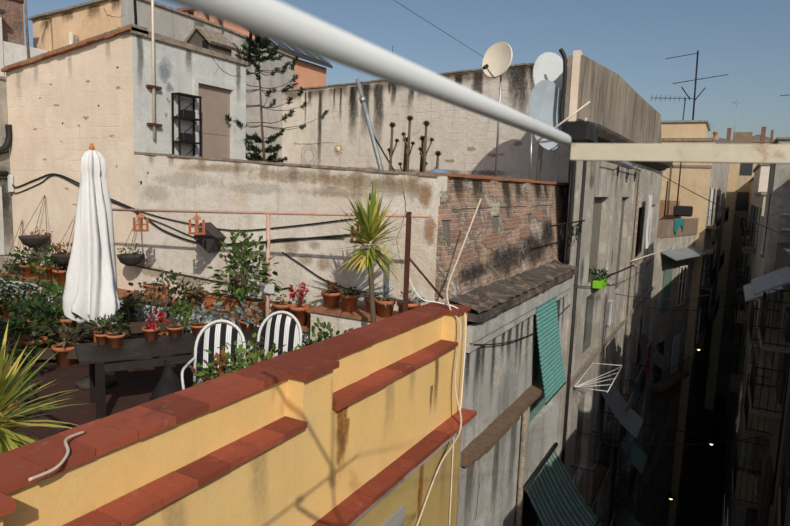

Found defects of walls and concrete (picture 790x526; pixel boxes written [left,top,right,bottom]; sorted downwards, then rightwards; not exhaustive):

water stain [286,82,398,147]
water stain [443,72,485,94]
water stain [502,66,534,106]
water stain [461,221,554,282]